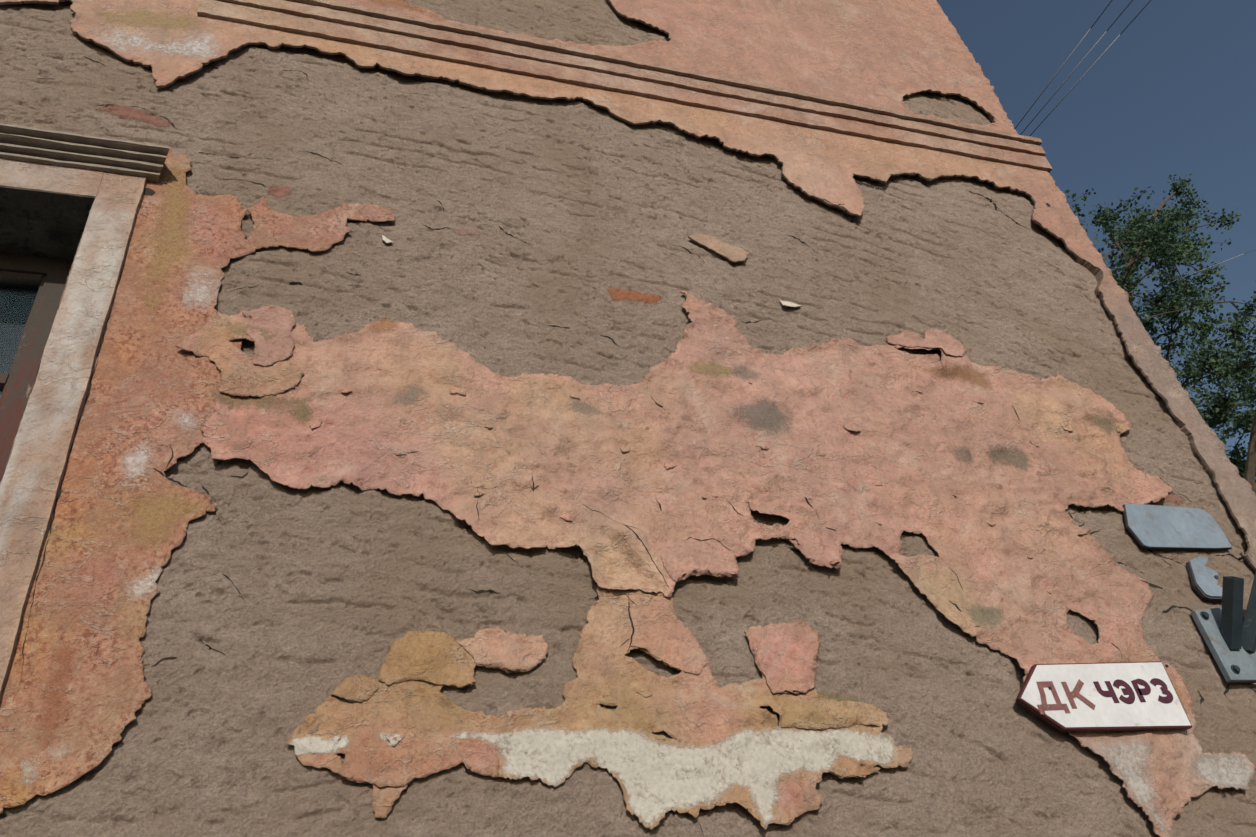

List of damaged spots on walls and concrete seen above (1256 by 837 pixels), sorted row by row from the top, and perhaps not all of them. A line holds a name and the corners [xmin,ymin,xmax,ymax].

spalling [0,0,1177,425]
crack [583,504,669,651]
spalling [0,290,1256,837]